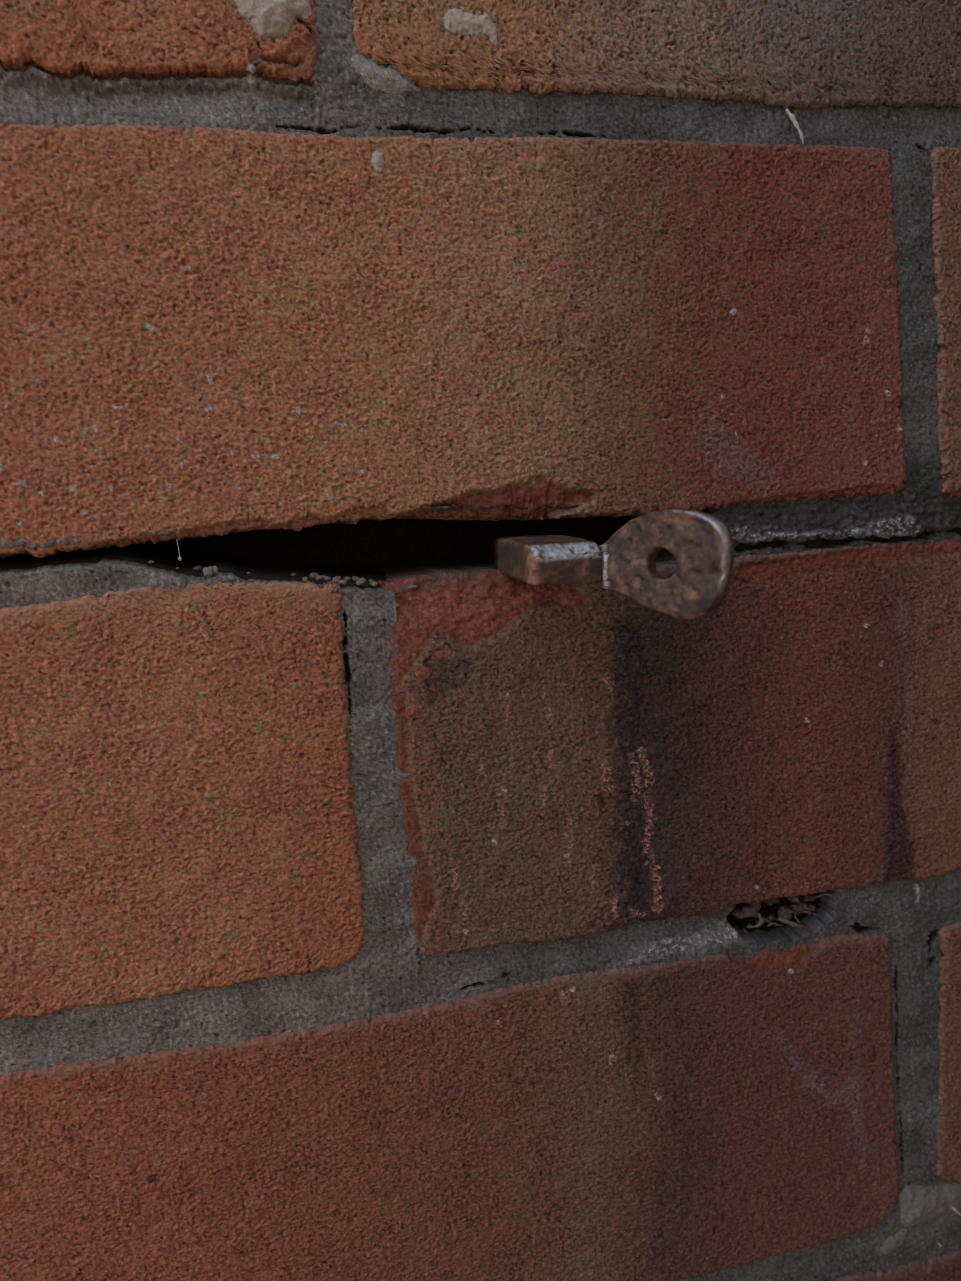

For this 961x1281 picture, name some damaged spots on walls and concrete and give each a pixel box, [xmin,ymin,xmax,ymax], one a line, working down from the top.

crack [734,527,961,553]
crack [656,548,676,562]
crack [0,516,639,714]